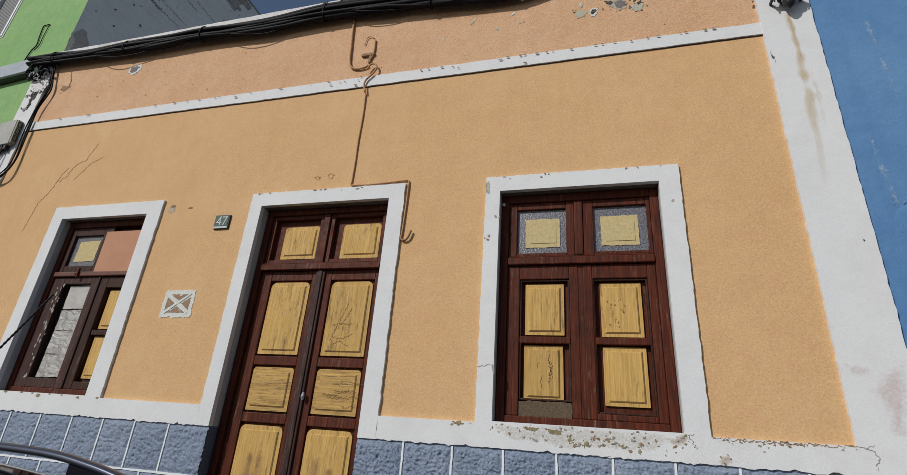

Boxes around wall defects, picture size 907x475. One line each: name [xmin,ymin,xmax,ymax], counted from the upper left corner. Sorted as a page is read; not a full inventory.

peeling [227,0,251,11]
peeling [573,0,648,19]
peeling [65,29,89,51]
crack [22,144,101,231]
peeling [491,400,689,456]